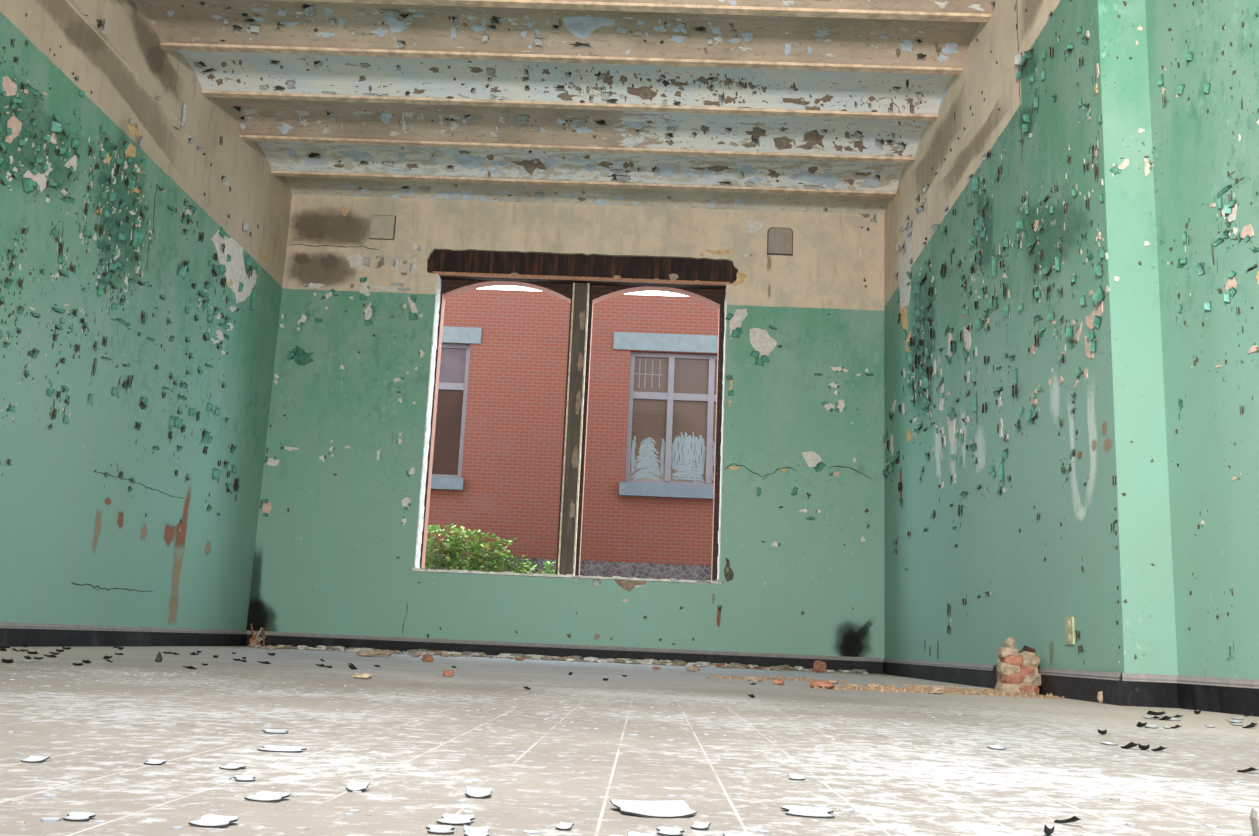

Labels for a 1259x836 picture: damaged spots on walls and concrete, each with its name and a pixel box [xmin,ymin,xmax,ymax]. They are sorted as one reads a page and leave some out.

peeling [167,2,758,54]
peeling [194,59,295,91]
peeling [1158,0,1259,141]
leakage [301,215,361,242]
leakage [295,256,345,281]
peeling [277,11,1154,571]
peeling [1167,171,1259,373]
crack [724,463,796,480]
corrosion [94,498,123,549]
corrosion [164,492,190,622]
leakage [247,558,273,631]
leakage [840,624,869,657]